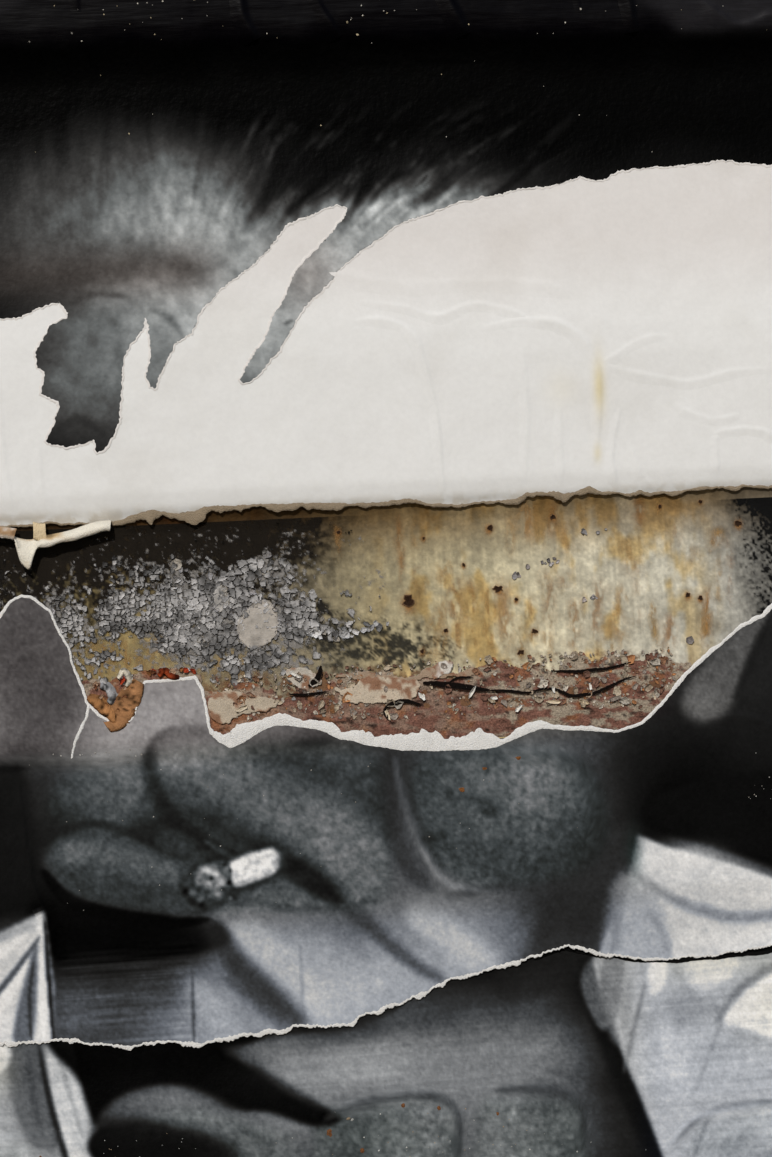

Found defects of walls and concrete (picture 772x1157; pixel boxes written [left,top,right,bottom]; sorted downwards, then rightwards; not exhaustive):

peeling [0,523,475,724]
rust [402,594,415,609]
rust [487,585,532,614]
rust [685,592,709,633]
rust [81,616,692,739]